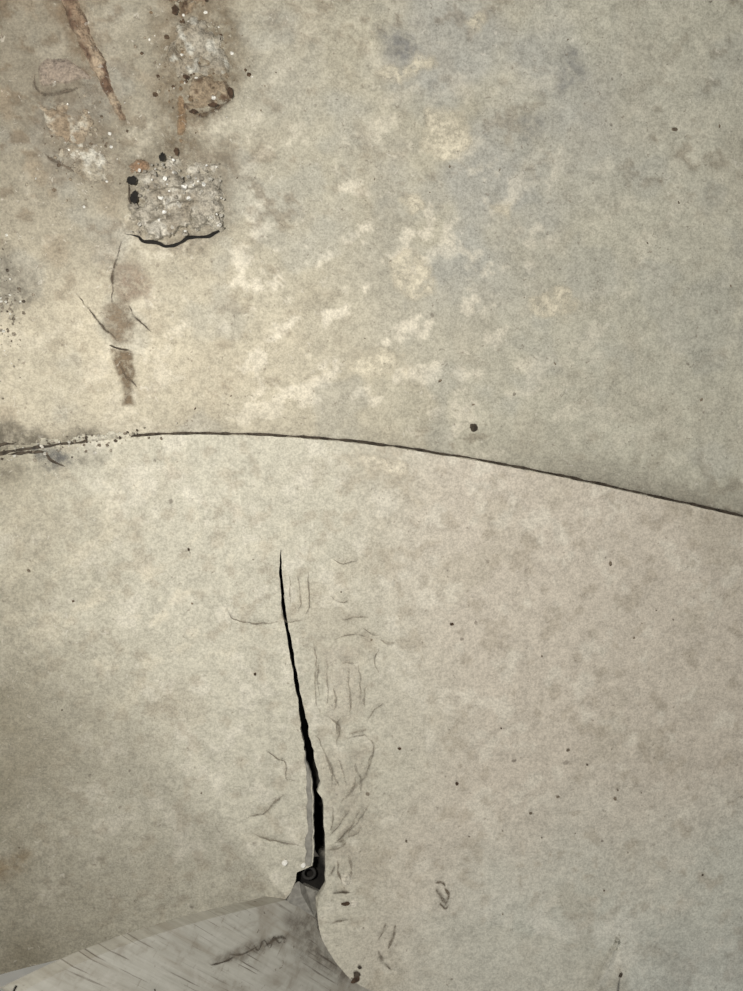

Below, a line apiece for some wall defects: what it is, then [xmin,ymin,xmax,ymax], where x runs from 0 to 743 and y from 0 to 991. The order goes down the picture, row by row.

rust [61,0,126,121]
spalling [134,0,253,156]
water stain [106,305,134,404]
crack [0,422,743,517]
crack [230,551,325,866]